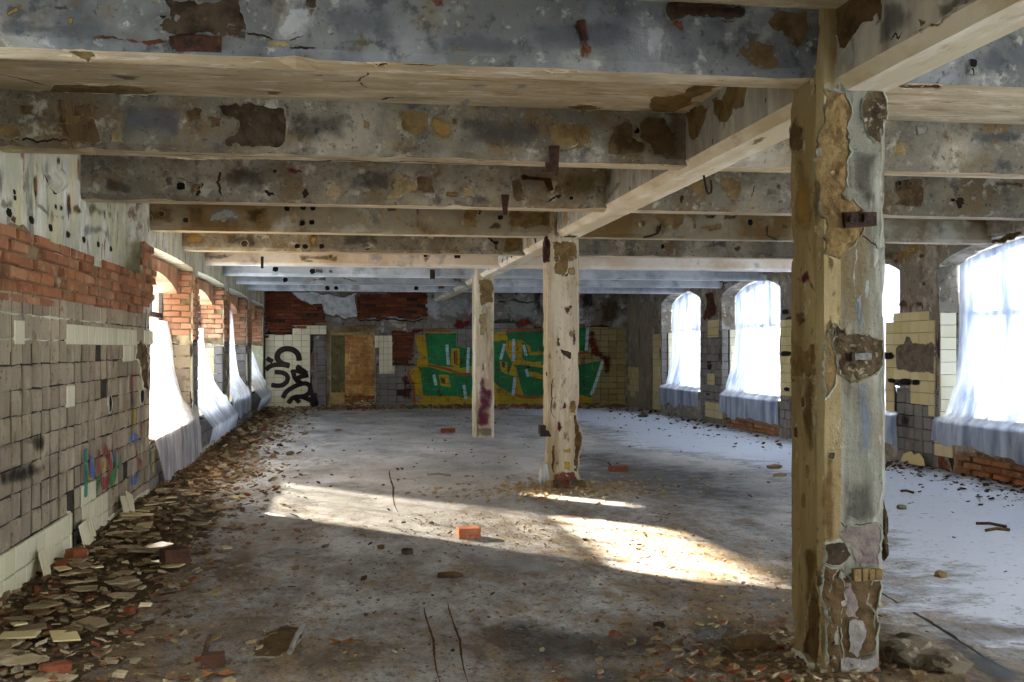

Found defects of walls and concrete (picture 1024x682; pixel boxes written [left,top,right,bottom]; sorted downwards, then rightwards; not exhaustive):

spalling [61,0,250,62]
spalling [738,7,811,72]
spalling [166,97,288,161]
spalling [607,85,749,167]
spalling [789,88,889,259]
flaking render [0,188,428,366]
spalling [552,209,581,277]
spalling [780,309,936,413]
spalling [802,522,884,673]